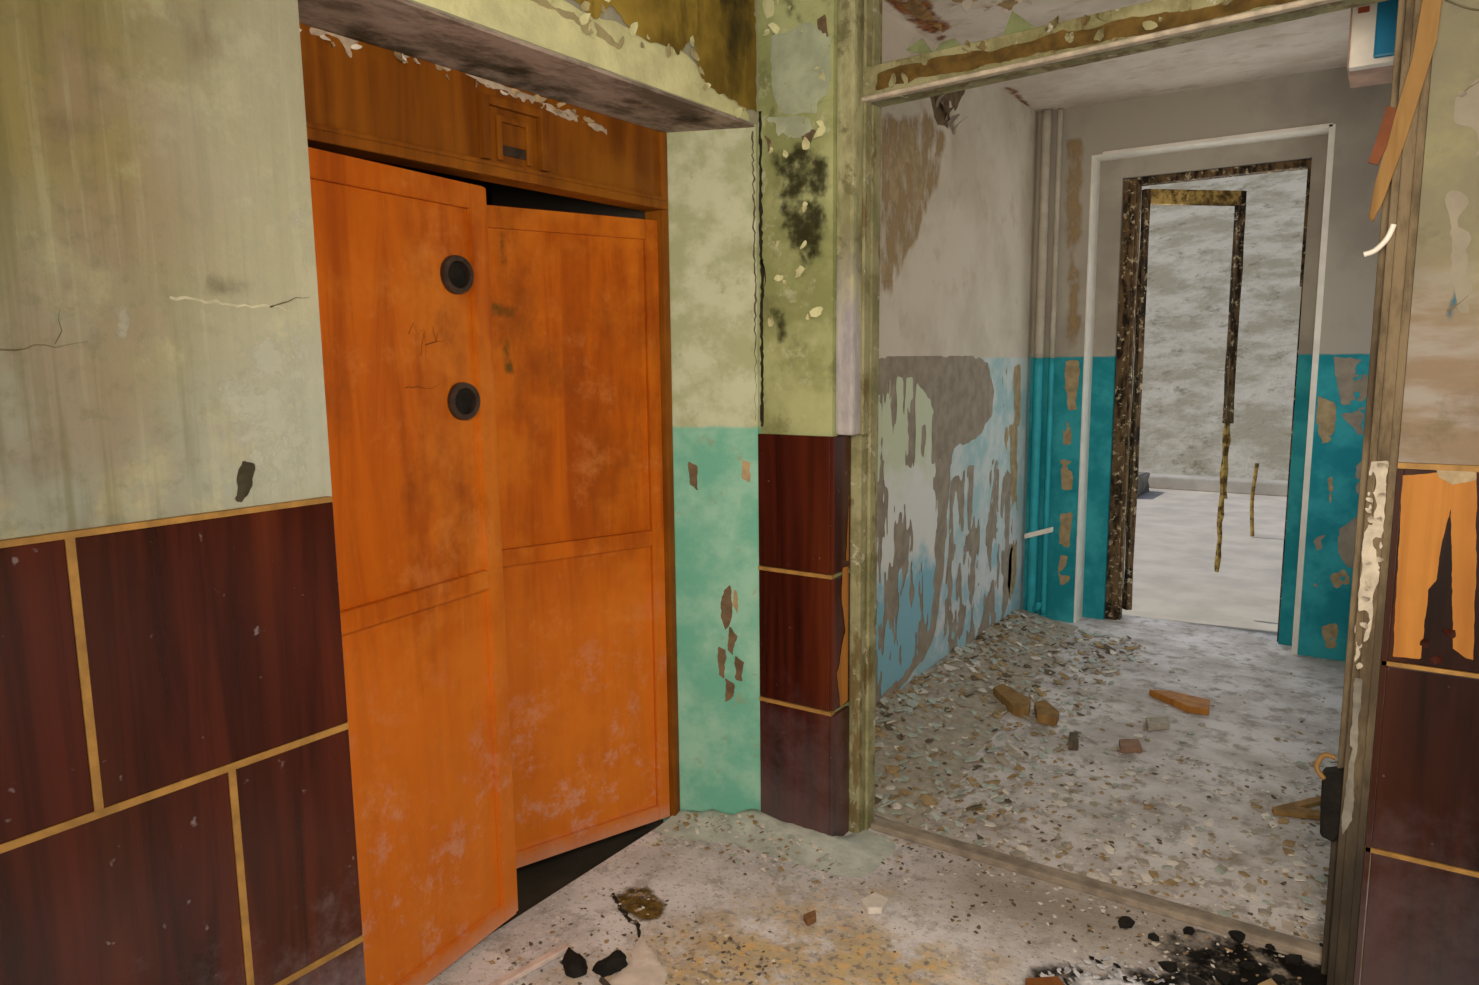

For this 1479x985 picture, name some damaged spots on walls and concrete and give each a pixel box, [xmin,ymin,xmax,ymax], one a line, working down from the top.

peeling [300,27,362,58]
peeling [394,0,831,158]
peeling [875,0,1296,90]
leakage [774,146,826,259]
peeling [881,90,968,289]
crack [0,309,83,351]
crack [169,296,310,312]
peeling [1060,360,1080,490]
peeling [1316,357,1368,444]
peeling [875,356,1021,705]
peeling [1058,512,1073,585]
peeling [717,585,744,702]